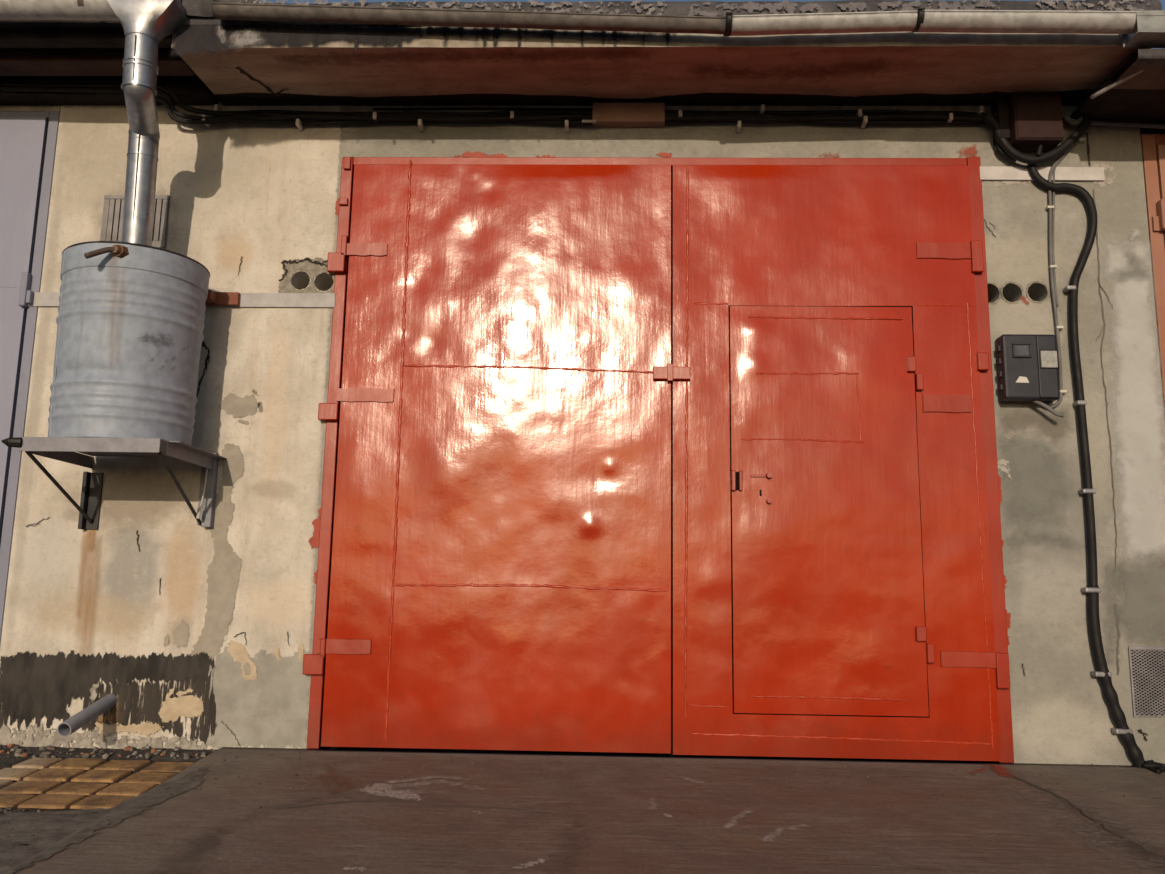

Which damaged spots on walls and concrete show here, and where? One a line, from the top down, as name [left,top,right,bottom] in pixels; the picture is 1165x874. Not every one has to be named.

leakage [171,24,675,62]
spalling [278,257,335,293]
peeling [218,389,263,425]
crack [1086,133,1121,675]
peeling [0,443,311,750]